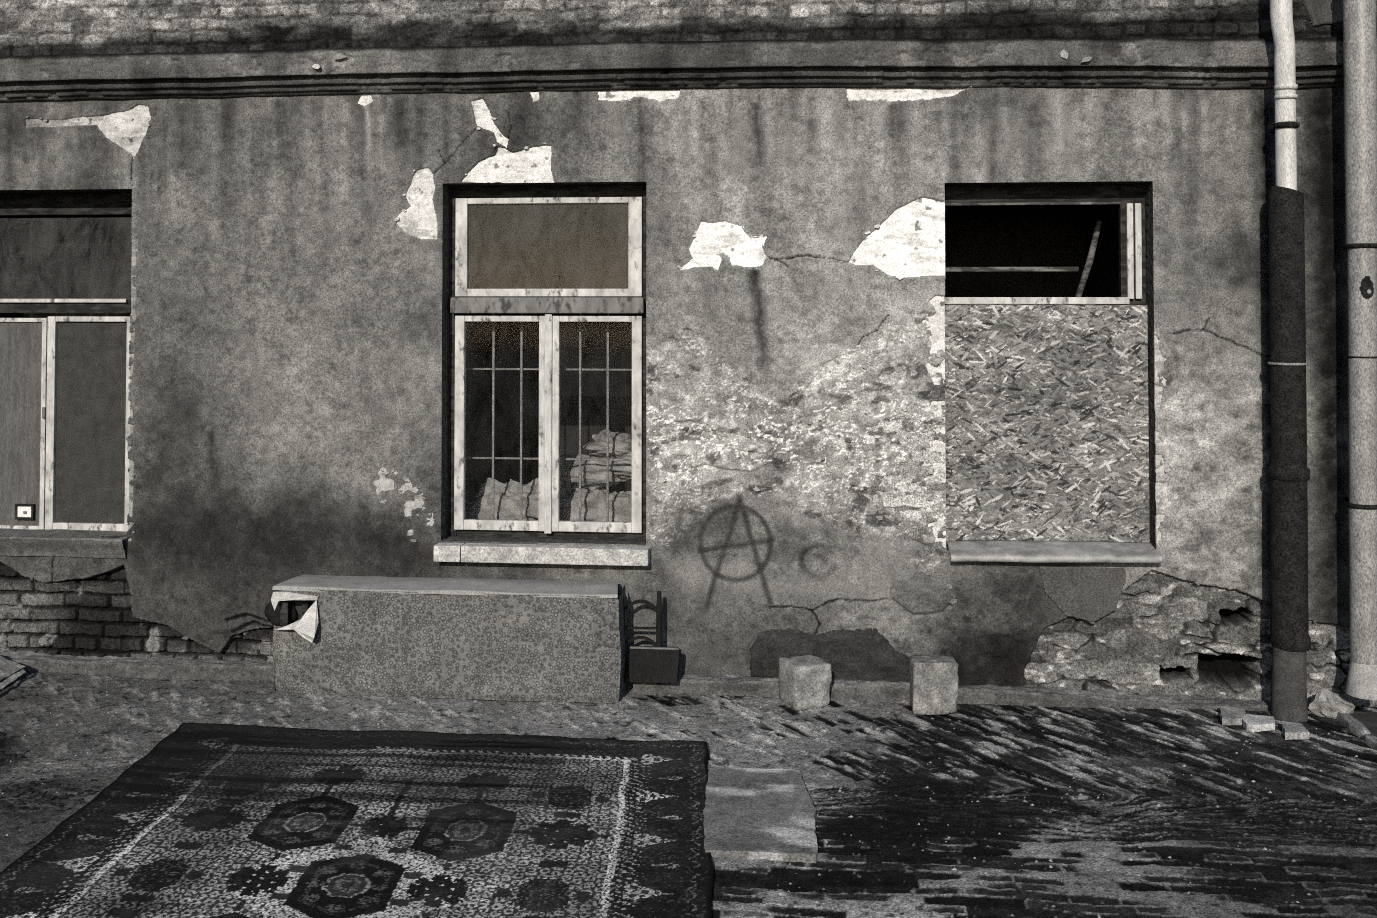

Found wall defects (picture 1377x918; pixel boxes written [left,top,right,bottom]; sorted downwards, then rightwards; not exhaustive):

spalling [26,105,151,159]
spalling [458,99,557,184]
spalling [395,168,437,239]
spalling [676,221,768,270]
spalling [849,198,945,280]
crack [1173,321,1262,356]
peeling [646,296,949,573]
spalling [0,562,274,662]
crack [770,598,887,634]
spalling [1023,570,1272,700]
spalling [1307,619,1377,708]